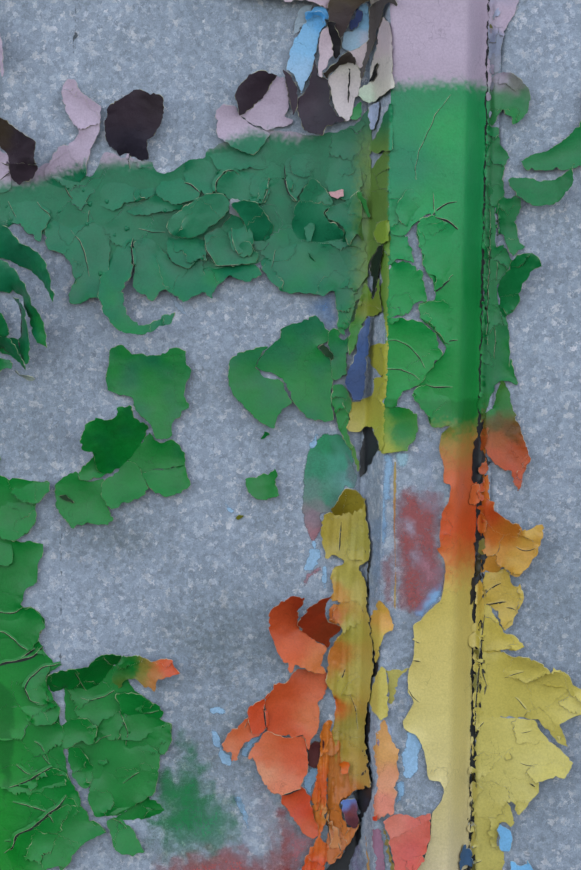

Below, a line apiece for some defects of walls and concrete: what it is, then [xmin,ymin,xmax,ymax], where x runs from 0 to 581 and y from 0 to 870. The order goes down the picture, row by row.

peeling [0,79,393,472]
crack [431,193,459,230]
crack [485,206,501,357]
peeling [215,0,581,870]
crack [386,338,452,388]
crack [0,607,159,746]
peeling [0,345,191,870]
crack [4,741,67,853]